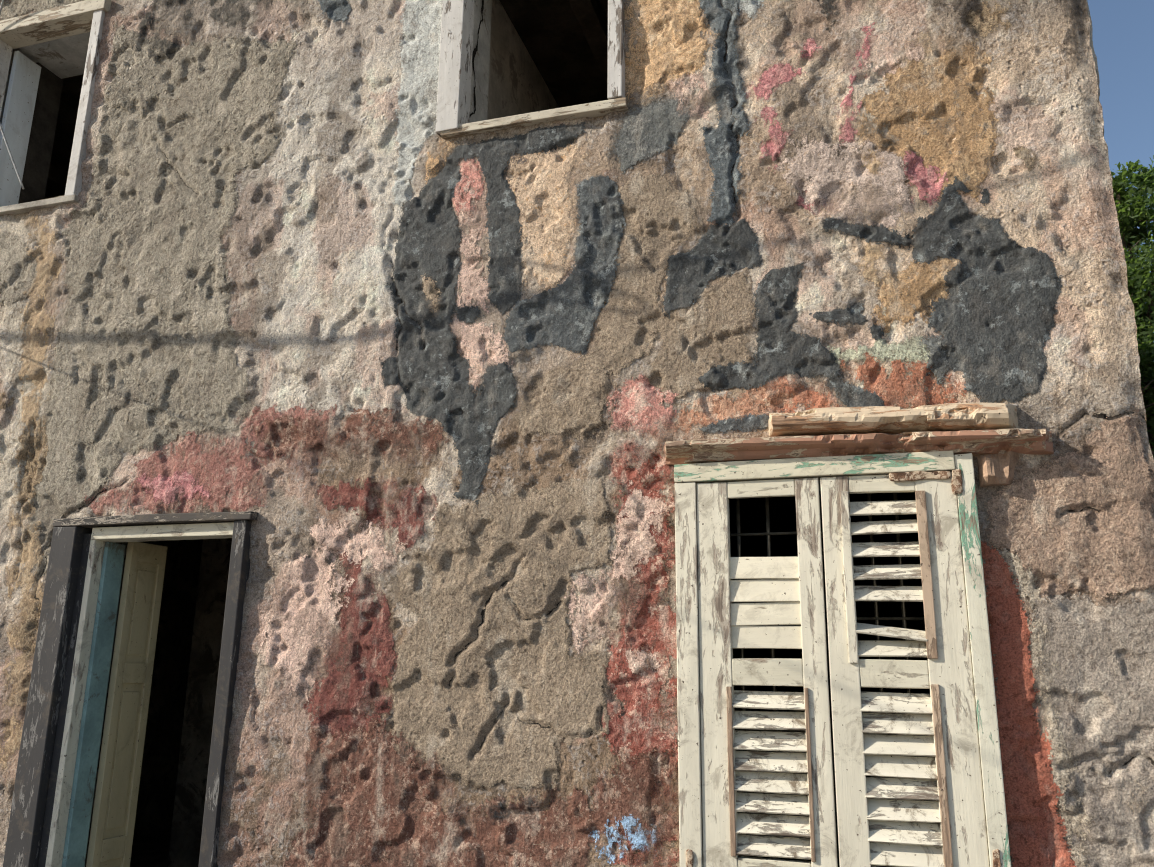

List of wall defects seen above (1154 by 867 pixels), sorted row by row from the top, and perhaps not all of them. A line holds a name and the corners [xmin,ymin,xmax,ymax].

crack [470,0,484,117]
crack [1049,412,1147,442]
crack [1060,507,1099,515]
crack [449,579,561,686]
crack [480,703,603,749]